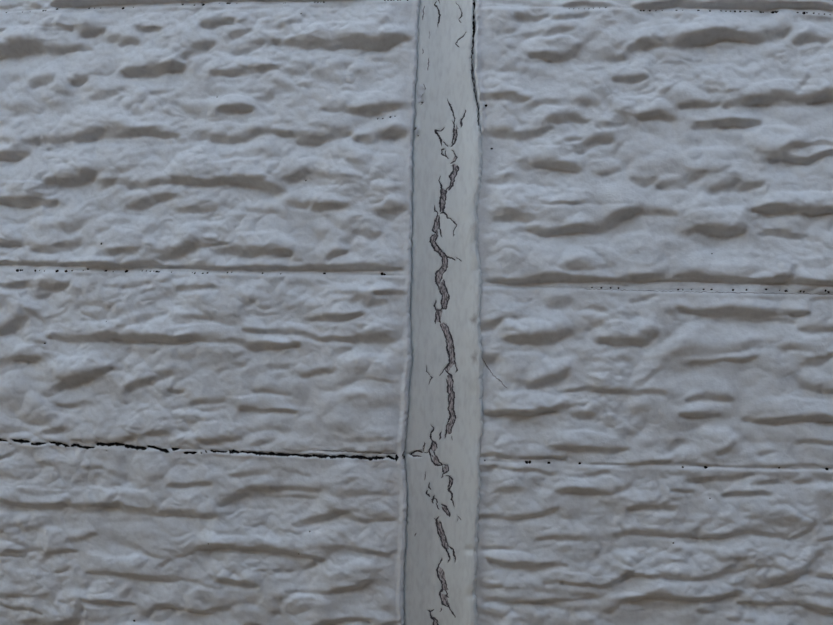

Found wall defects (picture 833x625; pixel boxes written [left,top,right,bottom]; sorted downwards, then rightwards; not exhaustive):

crack [313,0,479,625]